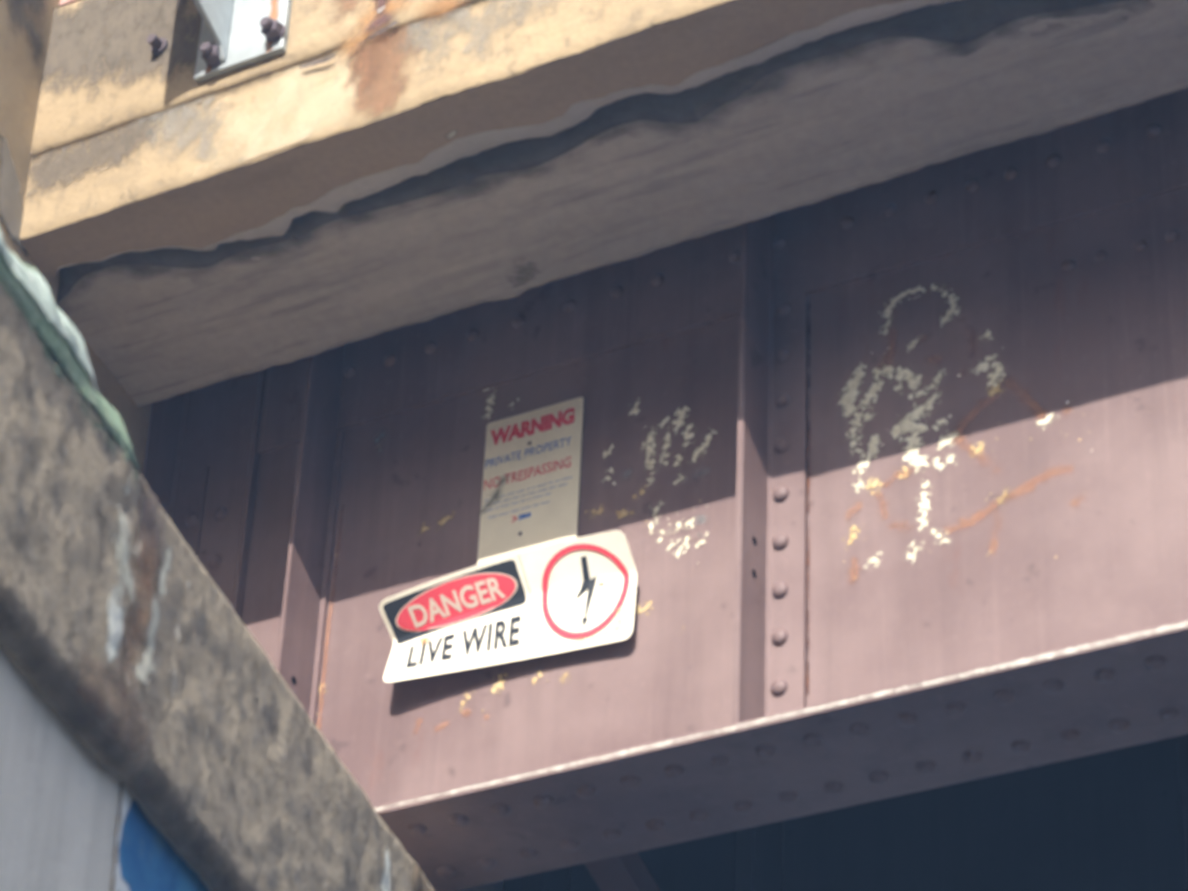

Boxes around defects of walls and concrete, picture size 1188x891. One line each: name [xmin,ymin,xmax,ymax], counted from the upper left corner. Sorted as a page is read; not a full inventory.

rust [353,0,407,115]
spalling [53,0,1123,302]
crack [0,216,28,255]